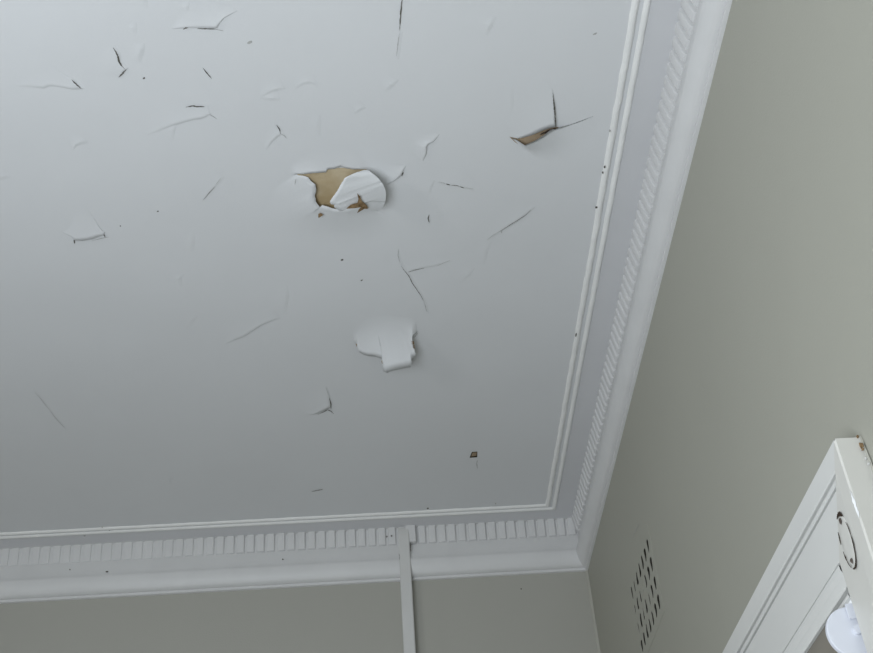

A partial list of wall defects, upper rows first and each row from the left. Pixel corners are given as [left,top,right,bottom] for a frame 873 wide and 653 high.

crack [384,1,403,59]
crack [17,45,128,90]
crack [148,102,215,139]
crack [480,201,535,240]